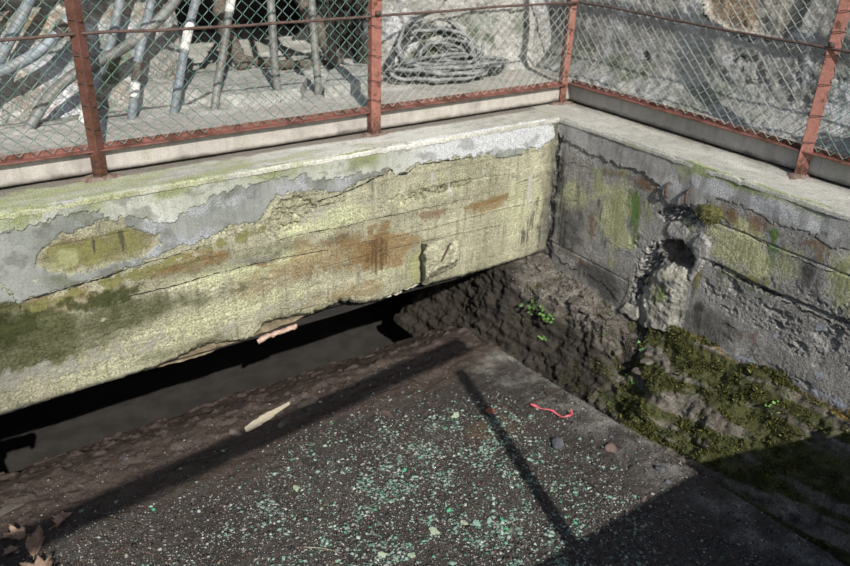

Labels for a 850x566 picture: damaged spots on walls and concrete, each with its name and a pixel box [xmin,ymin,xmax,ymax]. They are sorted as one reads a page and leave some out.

peeling [0,116,850,321]
damp [592,168,652,244]
crack [724,218,850,276]
spalling [175,287,348,357]
damp [694,302,756,365]
crack [712,263,850,330]
damp [799,382,850,417]